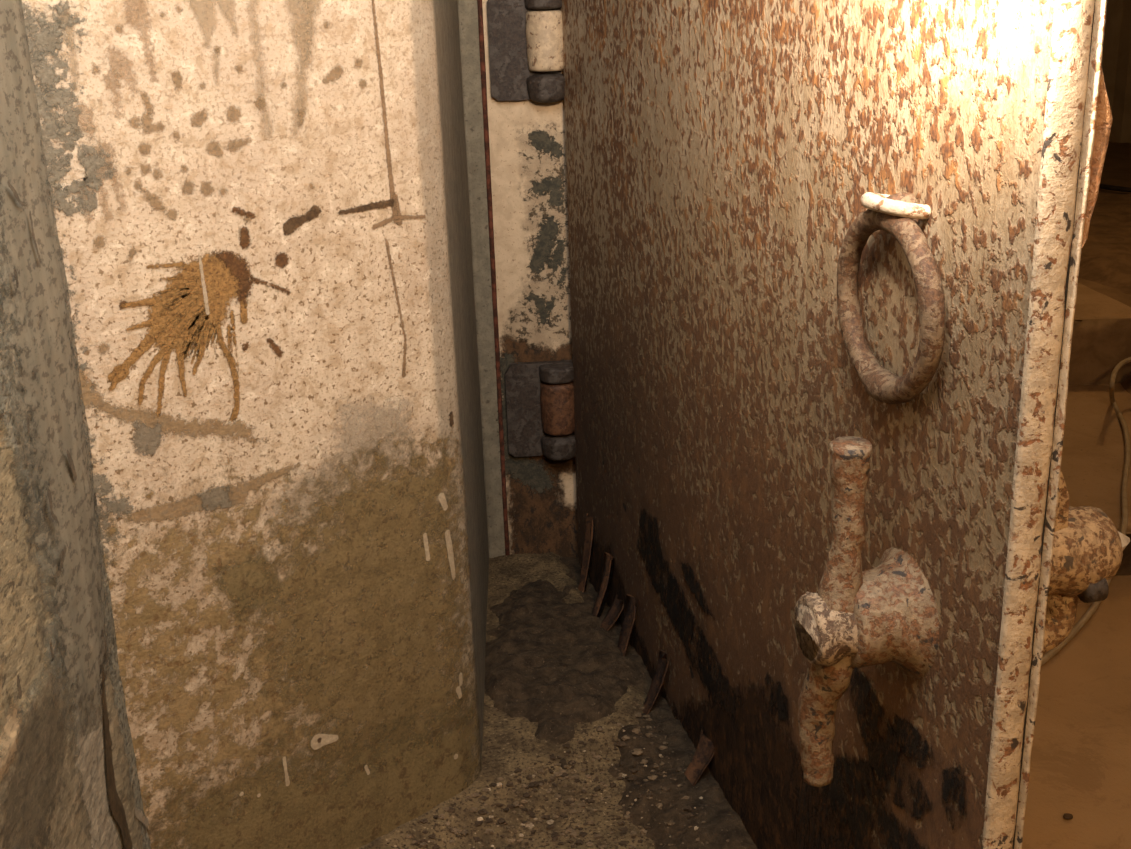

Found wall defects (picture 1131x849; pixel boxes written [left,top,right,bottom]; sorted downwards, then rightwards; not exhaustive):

water stain [76,0,237,221]
water stain [206,138,251,157]
water stain [227,105,241,121]
water stain [250,1,272,132]
water stain [281,0,328,134]
water stain [322,65,343,84]
rust [108,207,290,421]
peeling [495,125,572,494]
water stain [77,368,263,456]
water stain [98,428,482,849]
water stain [74,680,120,849]
crack [100,625,151,849]